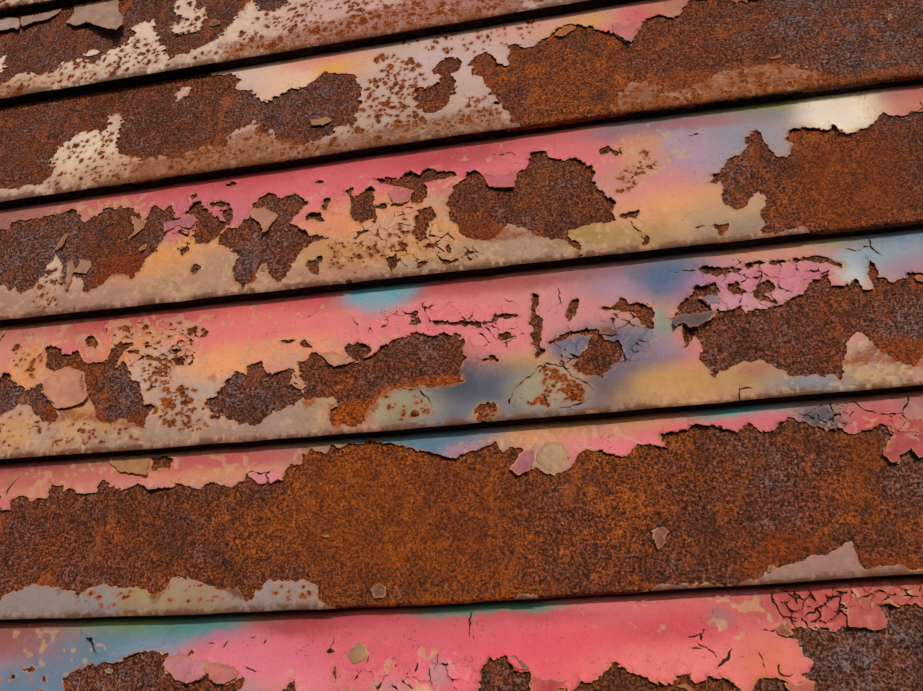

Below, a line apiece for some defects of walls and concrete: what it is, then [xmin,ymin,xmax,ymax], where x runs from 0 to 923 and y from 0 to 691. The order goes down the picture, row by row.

peeling [0,0,287,85]
peeling [416,0,923,132]
rust [610,62,908,114]
peeling [0,72,362,190]
peeling [711,111,923,238]
crack [354,207,479,271]
crack [353,300,523,347]
crack [508,303,654,408]
rust [845,337,923,366]
peeling [0,417,923,609]
crack [764,582,923,632]
crack [689,629,732,681]